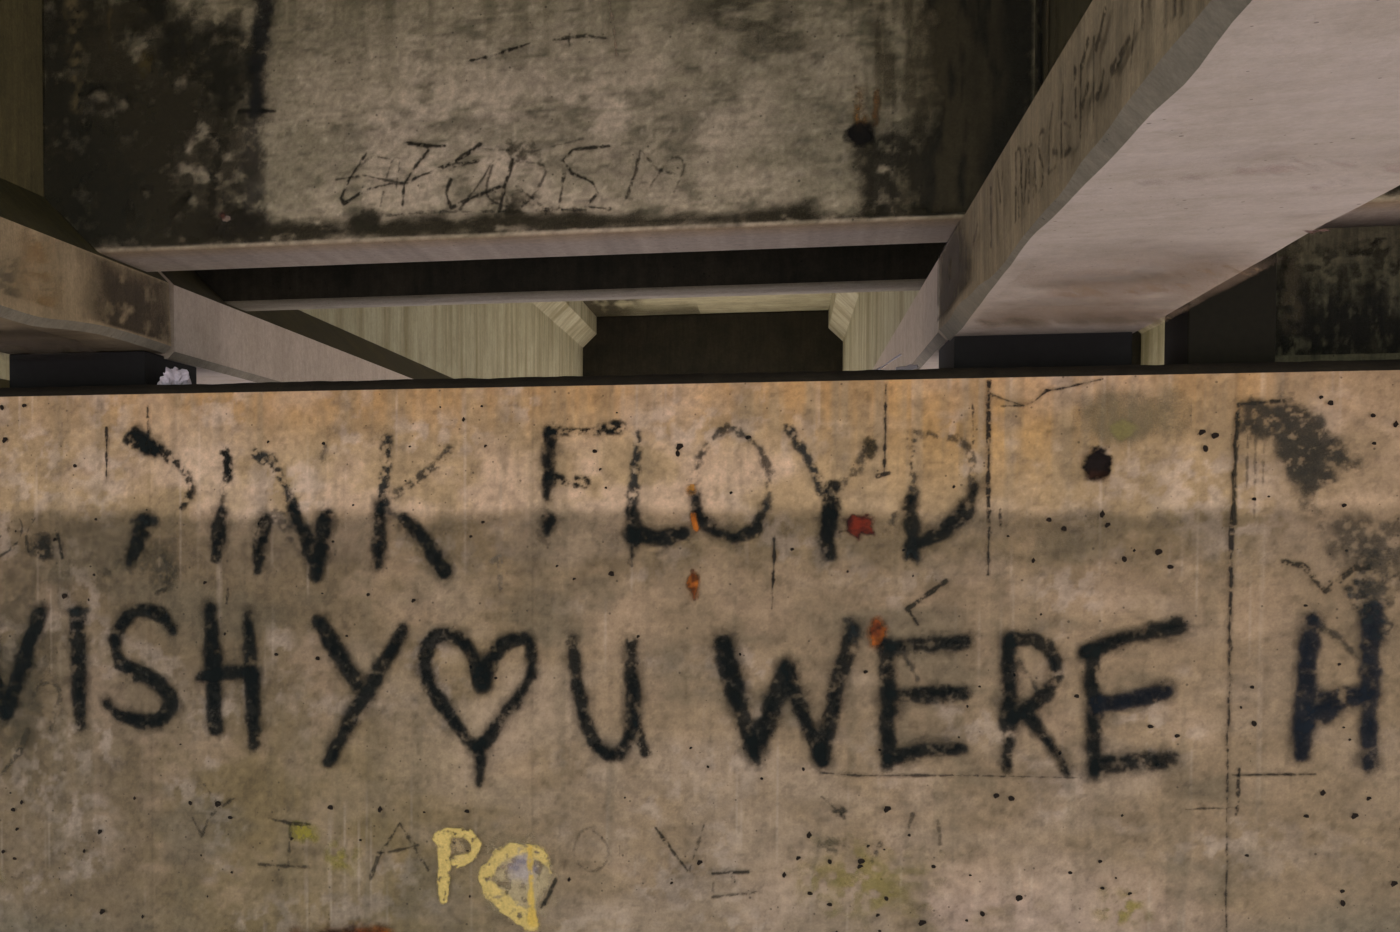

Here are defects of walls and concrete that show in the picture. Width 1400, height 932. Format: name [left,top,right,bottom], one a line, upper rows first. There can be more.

leakage [42,0,275,339]